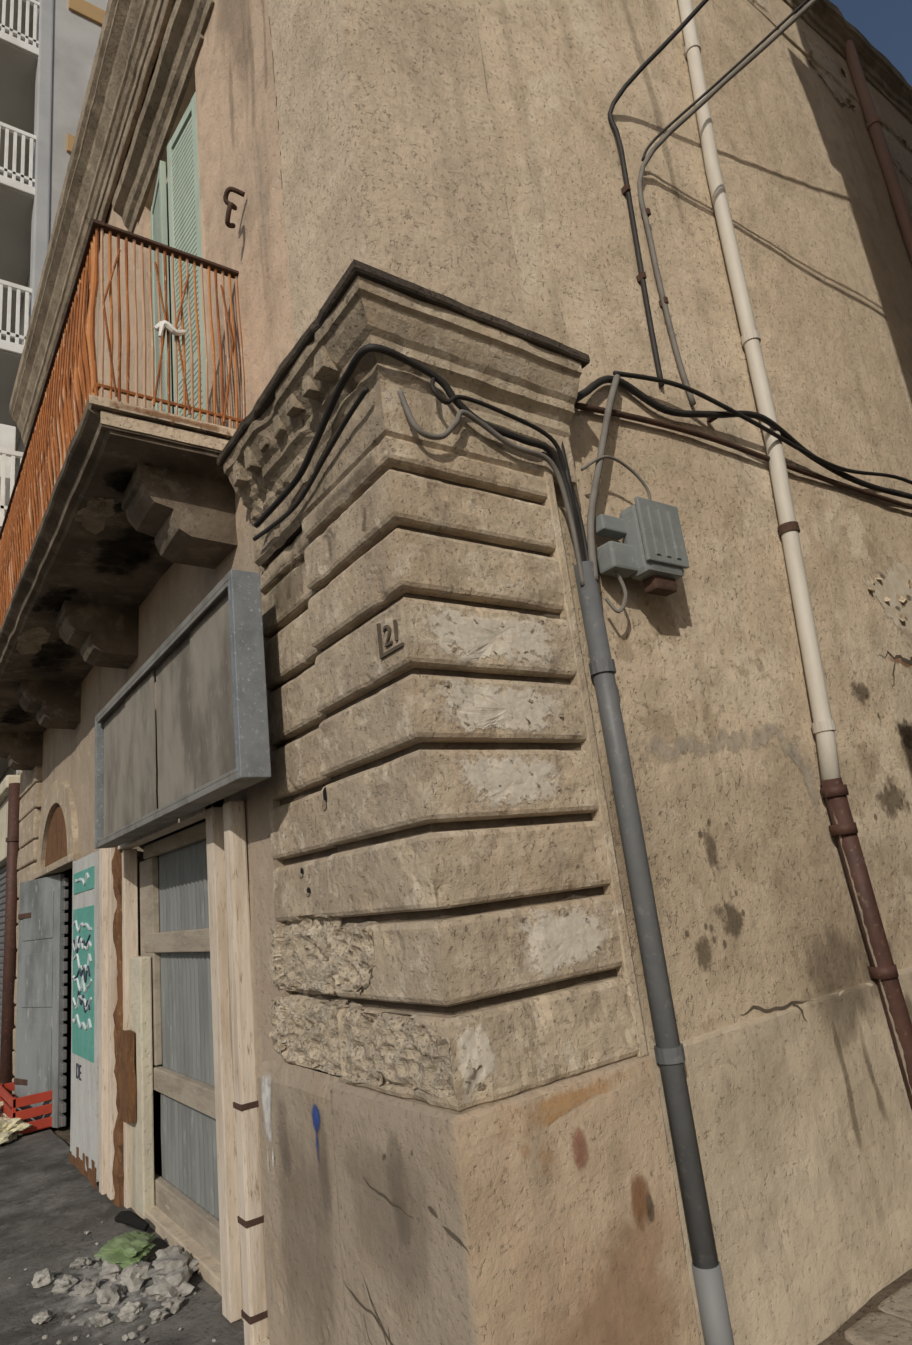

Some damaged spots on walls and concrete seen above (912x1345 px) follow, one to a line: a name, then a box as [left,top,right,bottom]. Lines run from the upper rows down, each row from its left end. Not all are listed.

damp [106,464,150,512]
damp [96,529,155,575]
crack [881,650,912,685]
damp [699,818,717,864]
damp [685,891,745,967]
spalling [269,914,494,1100]
crack [741,1001,807,1021]
rust [573,1132,586,1166]
crack [364,1178,469,1253]
crack [345,1278,393,1345]